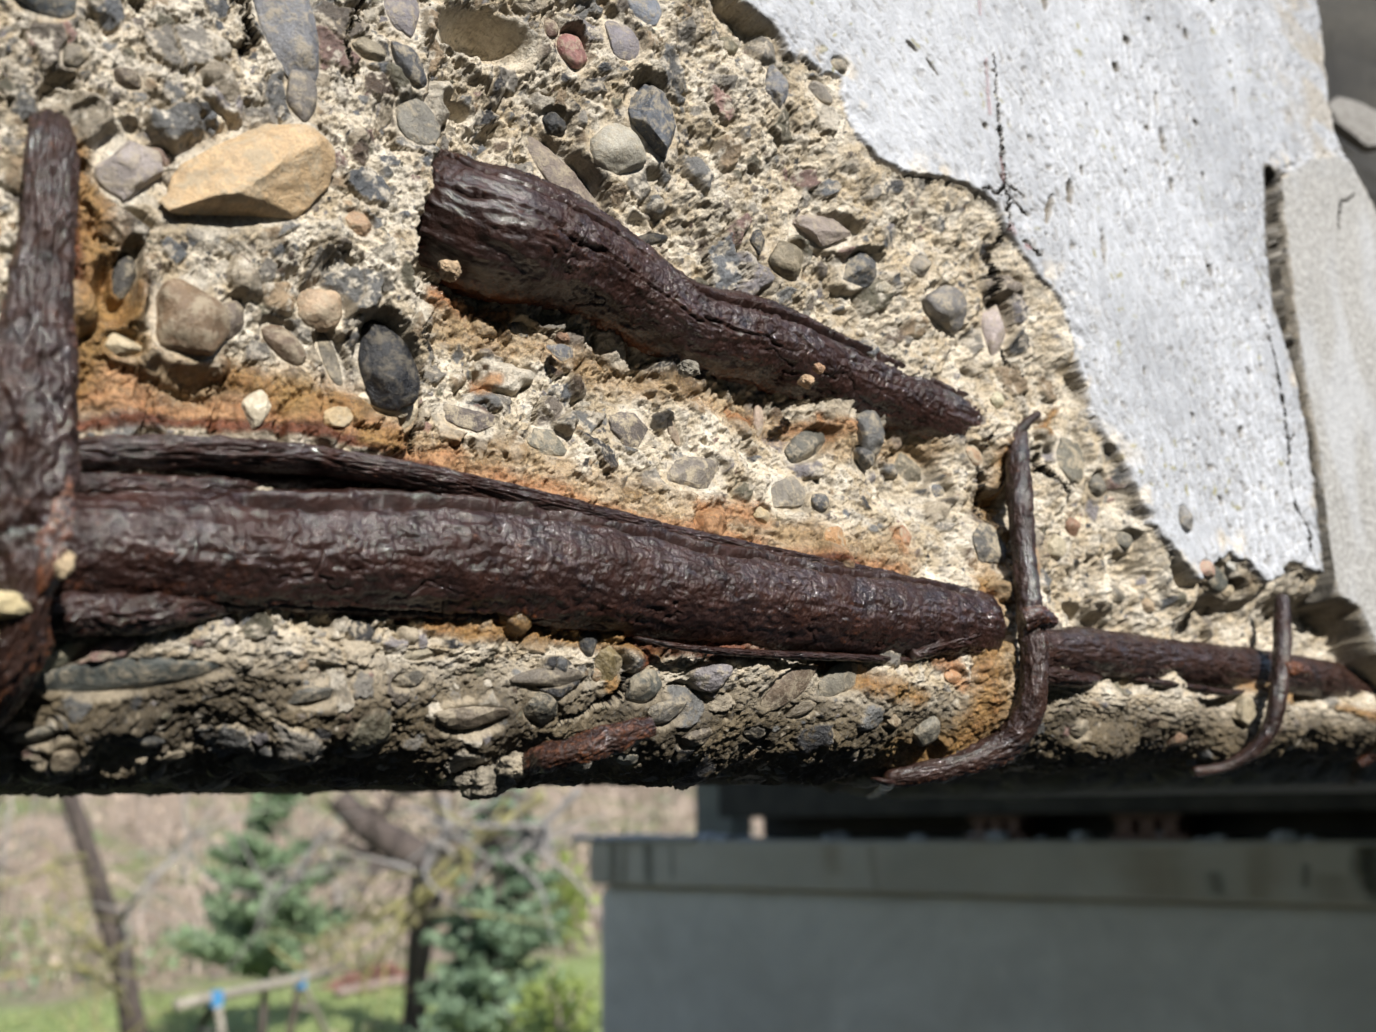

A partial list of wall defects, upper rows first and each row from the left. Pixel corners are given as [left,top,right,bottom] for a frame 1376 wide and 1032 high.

spalling [0,0,1376,799]
rust [0,143,1376,763]
crack [982,54,1043,307]
crack [1000,348,1025,377]